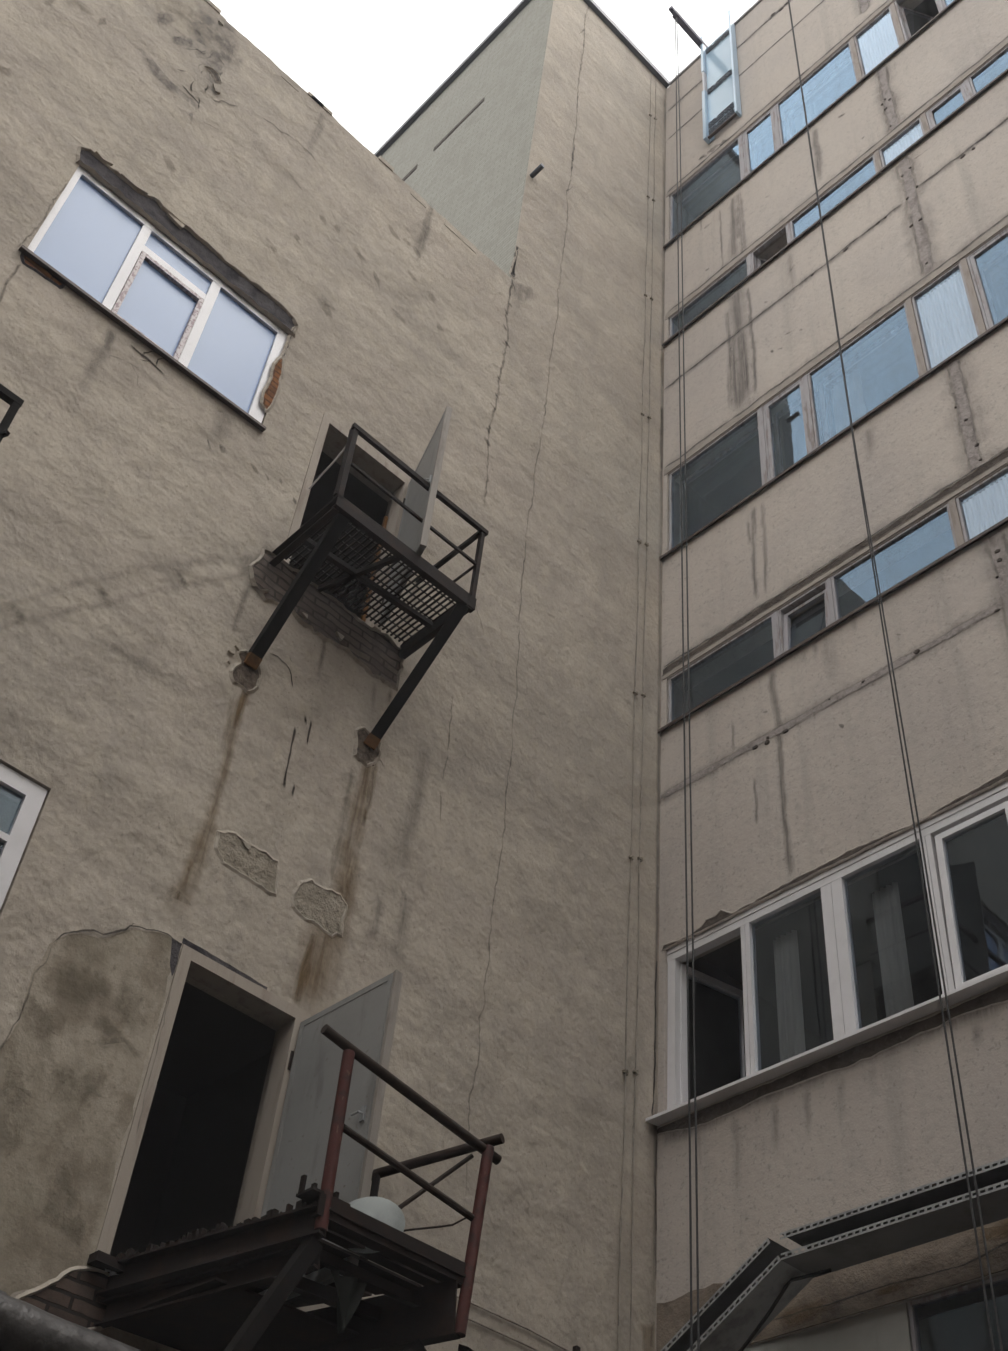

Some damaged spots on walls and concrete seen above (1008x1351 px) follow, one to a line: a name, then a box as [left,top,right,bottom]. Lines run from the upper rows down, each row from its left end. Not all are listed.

spalling [76,147,298,413]
flaking render [248,548,405,692]